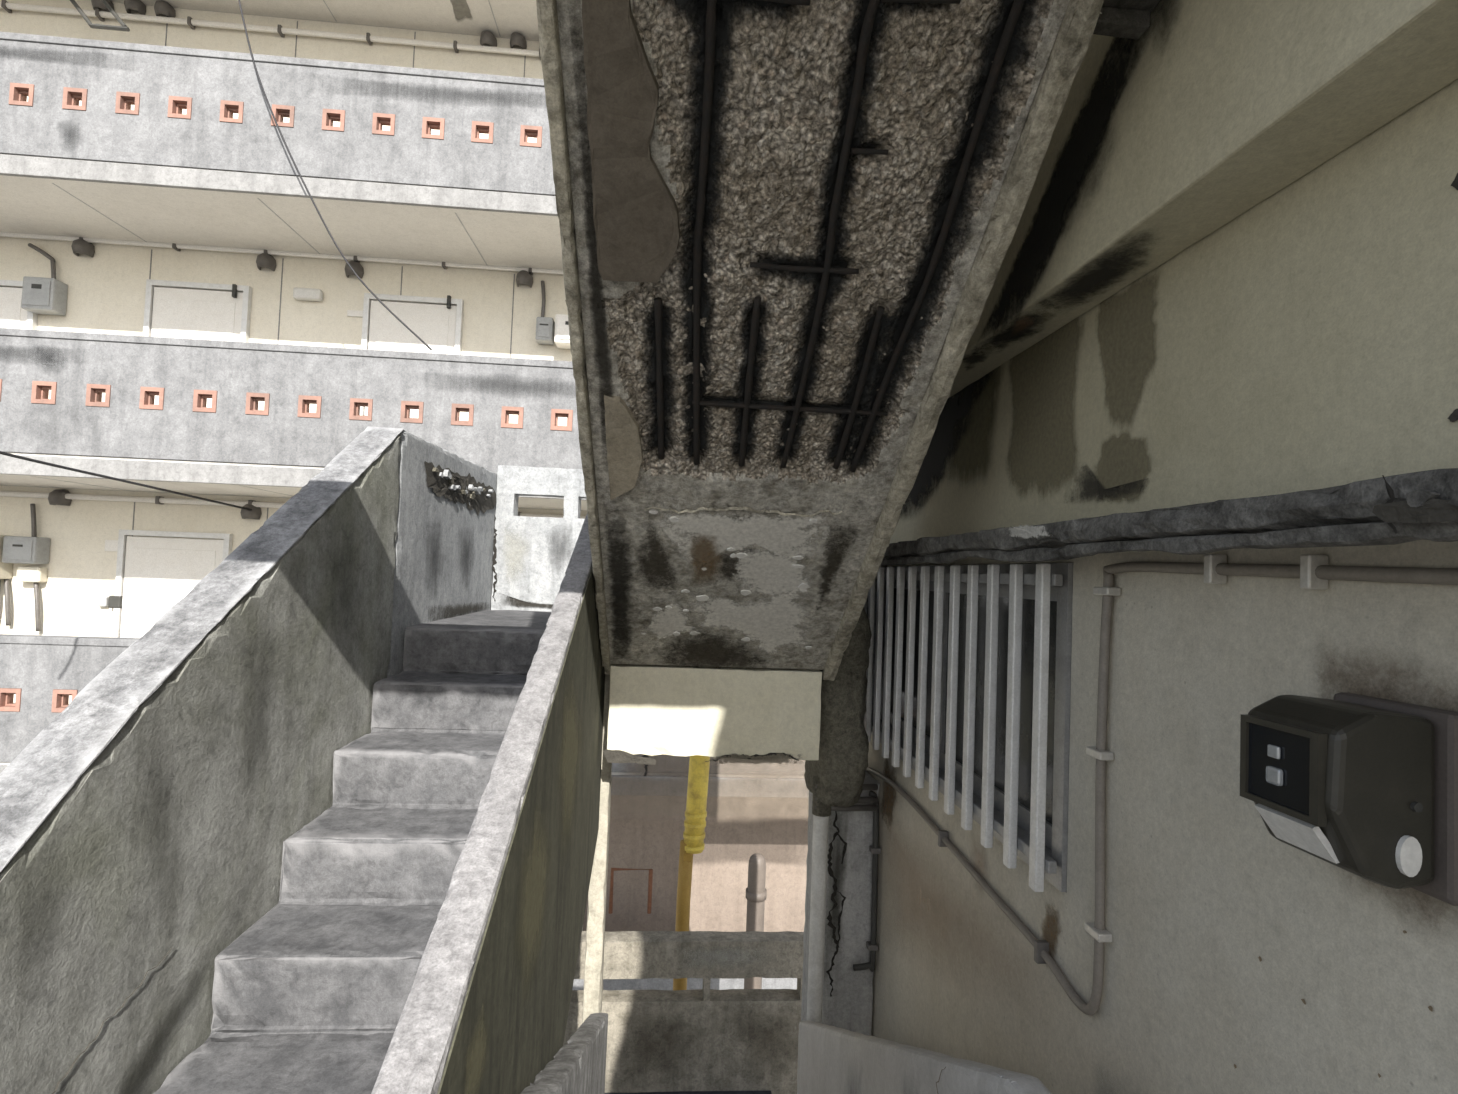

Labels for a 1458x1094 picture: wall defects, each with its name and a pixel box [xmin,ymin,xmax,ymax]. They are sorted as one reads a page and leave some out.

water stain [900,0,1173,514]
spalling [556,0,1070,670]
water stain [607,522,677,656]
water stain [664,632,763,670]
water stain [720,549,753,580]
water stain [817,527,856,610]
crack [826,811,847,997]